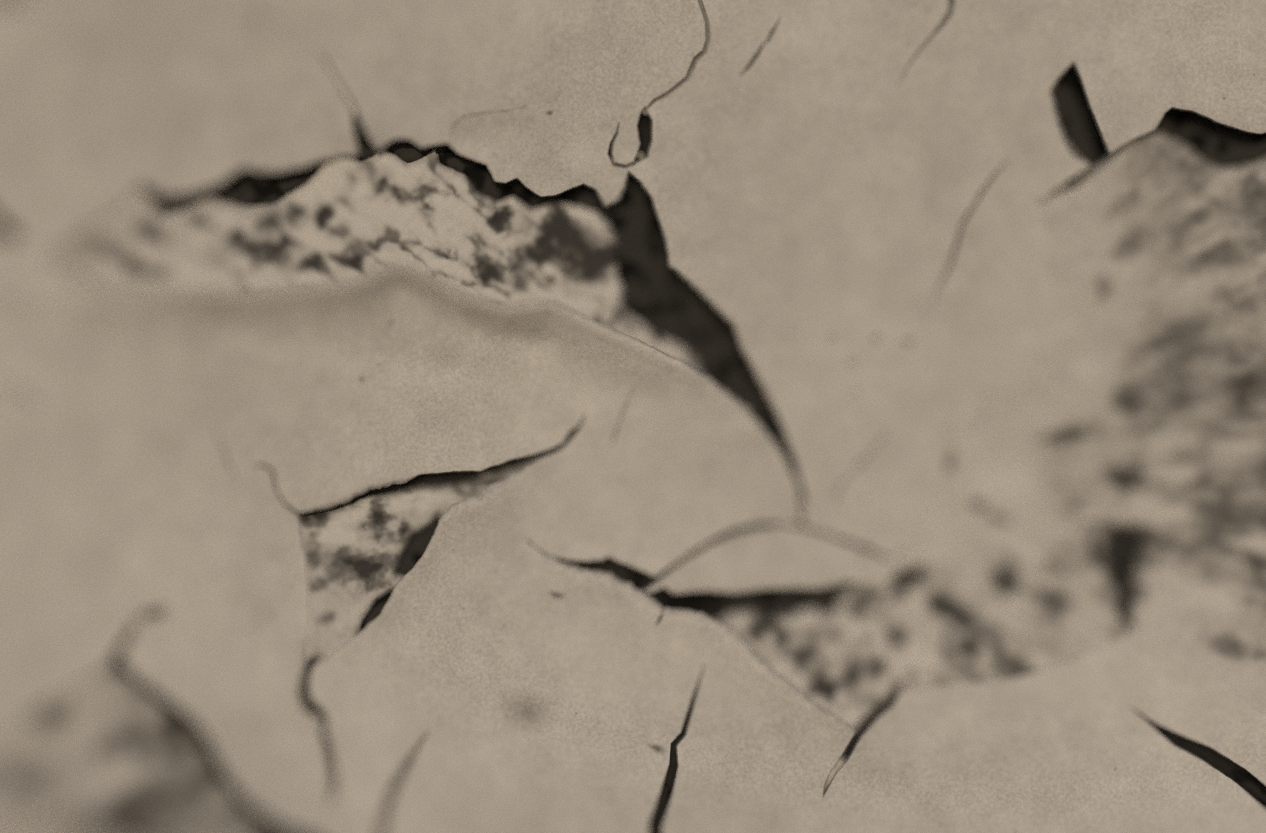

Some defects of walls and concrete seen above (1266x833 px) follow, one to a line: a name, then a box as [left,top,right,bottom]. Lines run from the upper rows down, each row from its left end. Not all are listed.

peeling [31,49,805,528]
peeling [252,414,585,806]
crack [740,17,781,76]
peeling [523,62,1266,798]
crack [897,0,955,86]
crack [932,159,1010,306]